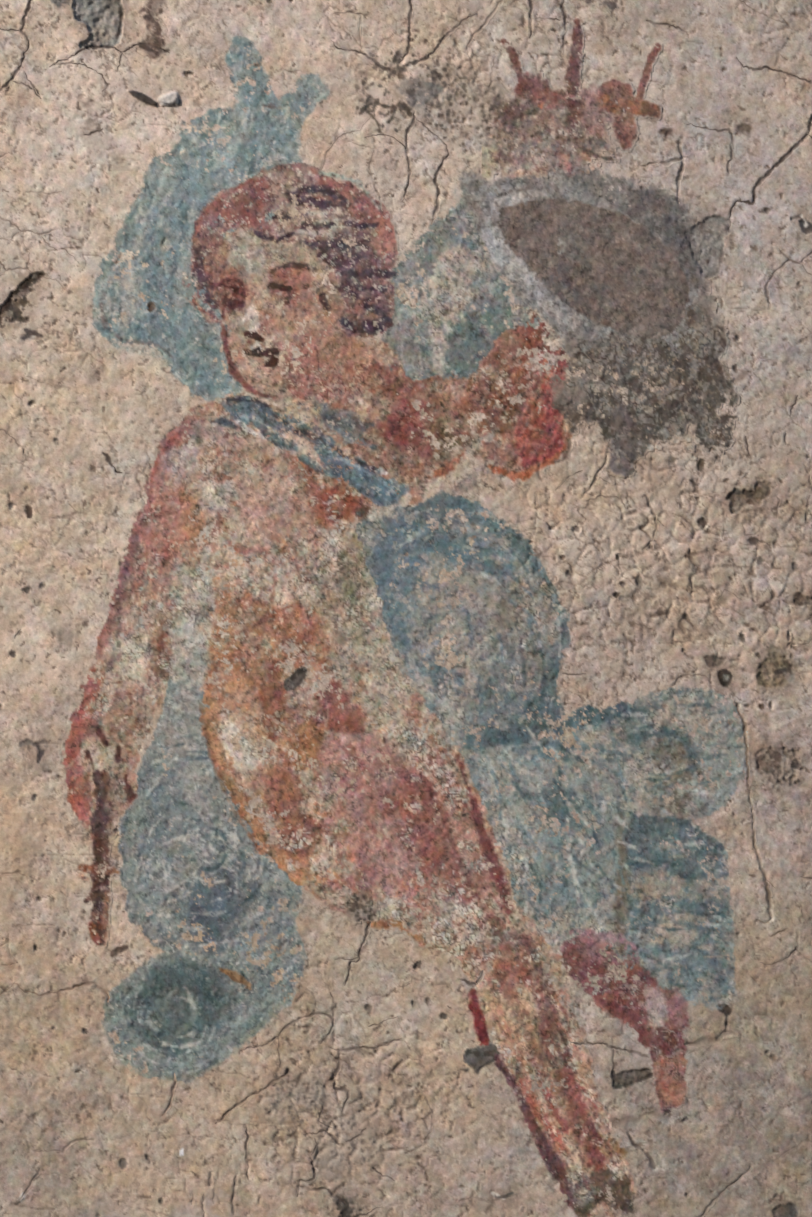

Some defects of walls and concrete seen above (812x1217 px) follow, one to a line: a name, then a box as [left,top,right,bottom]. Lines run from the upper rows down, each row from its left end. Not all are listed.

crack [0,0,170,99]
flaking render [49,0,171,60]
crack [331,0,568,97]
crack [646,19,687,33]
crack [736,57,812,84]
crack [84,128,103,136]
crack [321,110,450,225]
crack [640,114,812,232]
flaking render [0,269,48,342]